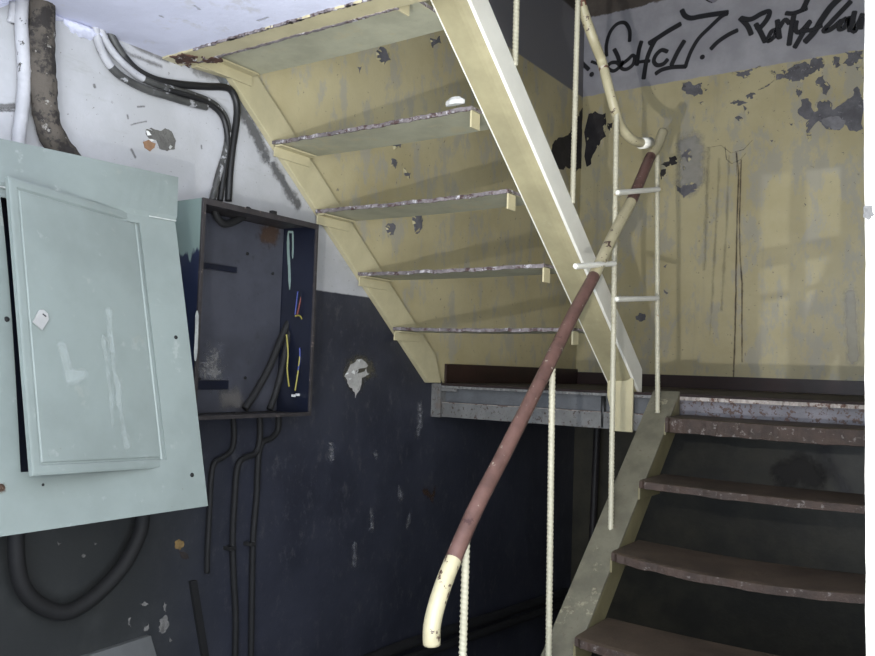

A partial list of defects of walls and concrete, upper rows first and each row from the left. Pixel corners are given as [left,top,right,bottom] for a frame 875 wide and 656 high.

peeling [214,8,399,58]
corrosion [169,53,223,78]
peeling [376,47,391,65]
peeling [681,81,707,105]
peeling [731,50,864,142]
flaking render [143,128,176,151]
peeling [551,108,613,171]
peeling [412,216,423,234]
flaking render [343,355,376,397]